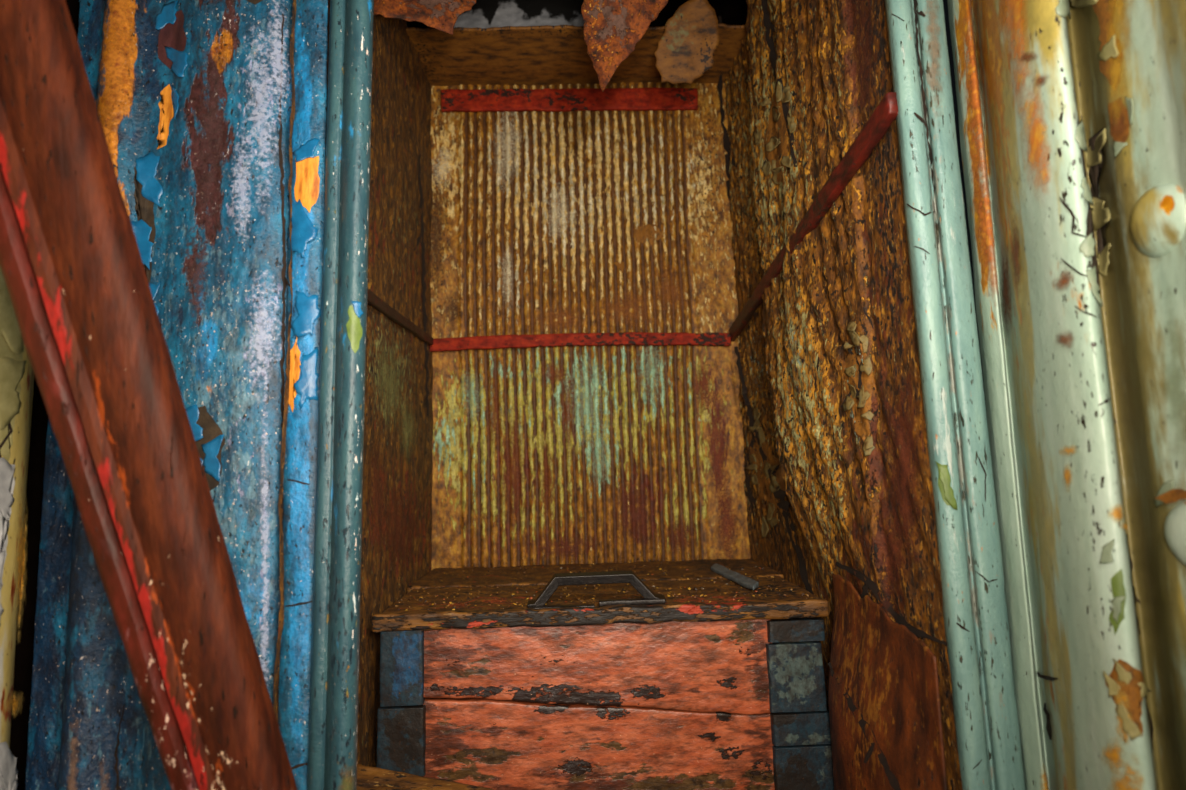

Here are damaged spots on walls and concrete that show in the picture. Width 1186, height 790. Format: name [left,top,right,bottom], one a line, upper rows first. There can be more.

rust [1003,0,1045,91]
peeling [131,1,188,314]
peeling [286,138,320,258]
rust [966,0,1020,324]
rust [1020,99,1048,180]
peeling [1056,0,1134,307]
rust [1057,273,1071,287]
peeling [286,291,321,412]
rust [540,445,555,508]
rust [693,366,735,552]
rust [1104,694,1143,790]